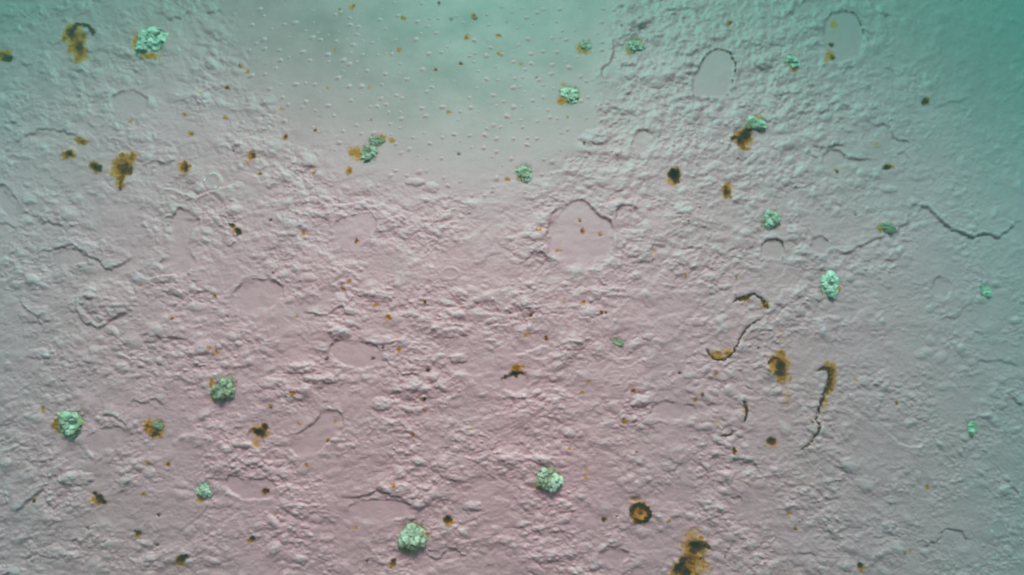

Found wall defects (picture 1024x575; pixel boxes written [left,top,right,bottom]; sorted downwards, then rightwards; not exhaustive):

rust [61,22,96,64]
rust [731,127,753,151]
rust [89,151,137,191]
spalling [521,199,647,269]
crack [837,201,1024,255]
crack [707,293,769,361]
crack [801,361,837,450]
rust [669,529,711,575]